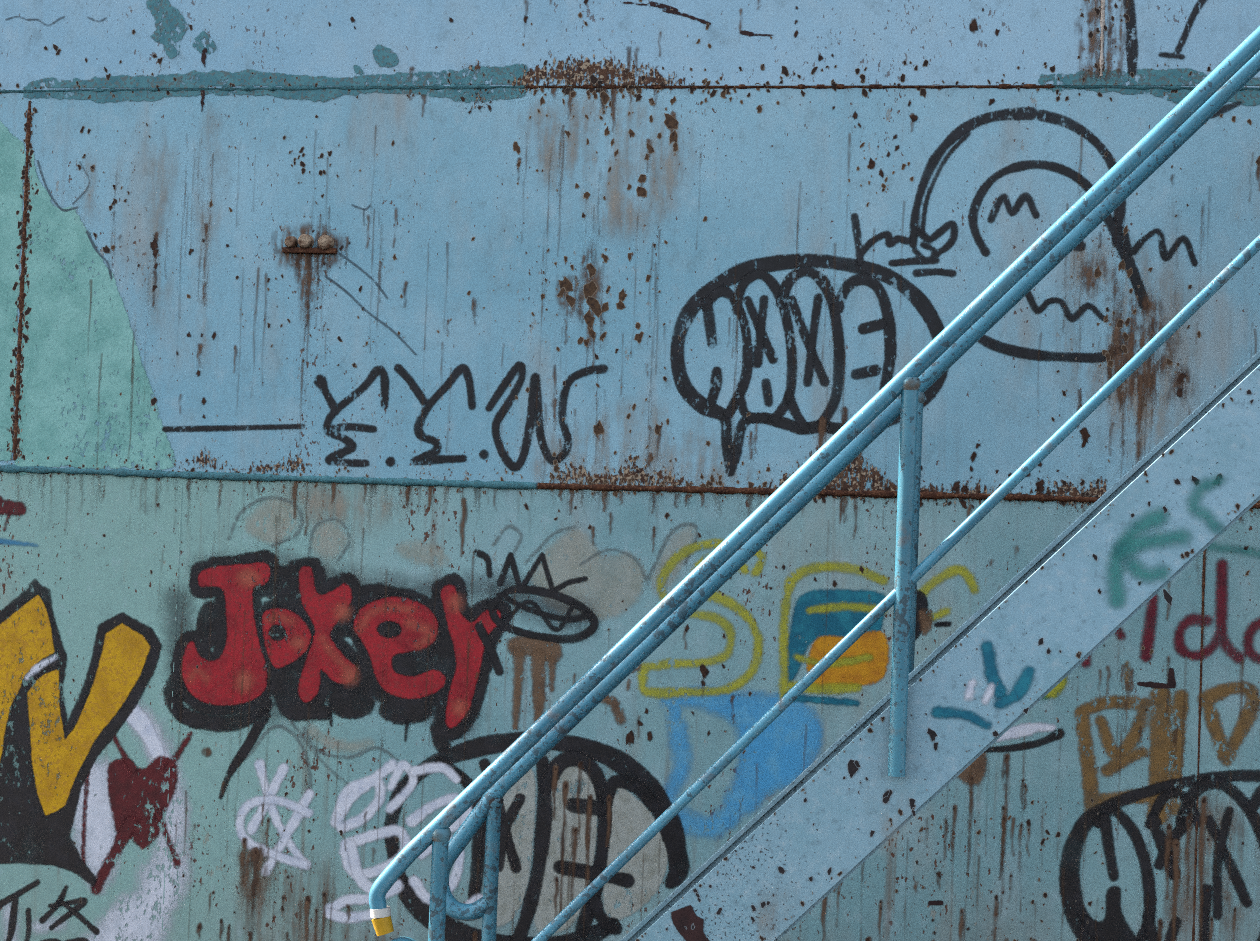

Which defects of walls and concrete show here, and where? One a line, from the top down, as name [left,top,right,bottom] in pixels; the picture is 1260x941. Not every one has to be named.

peeling [23,0,528,112]
corrosion [507,49,837,218]
corrosion [852,67,872,97]
corrosion [894,59,964,124]
corrosion [0,83,350,534]
corrosion [519,245,661,365]
corrosion [1070,259,1189,483]
corrosion [813,447,898,538]
corrosion [920,443,1114,528]
corrosion [197,911,252,941]
corrosion [223,804,270,915]
corrosion [784,871,843,936]